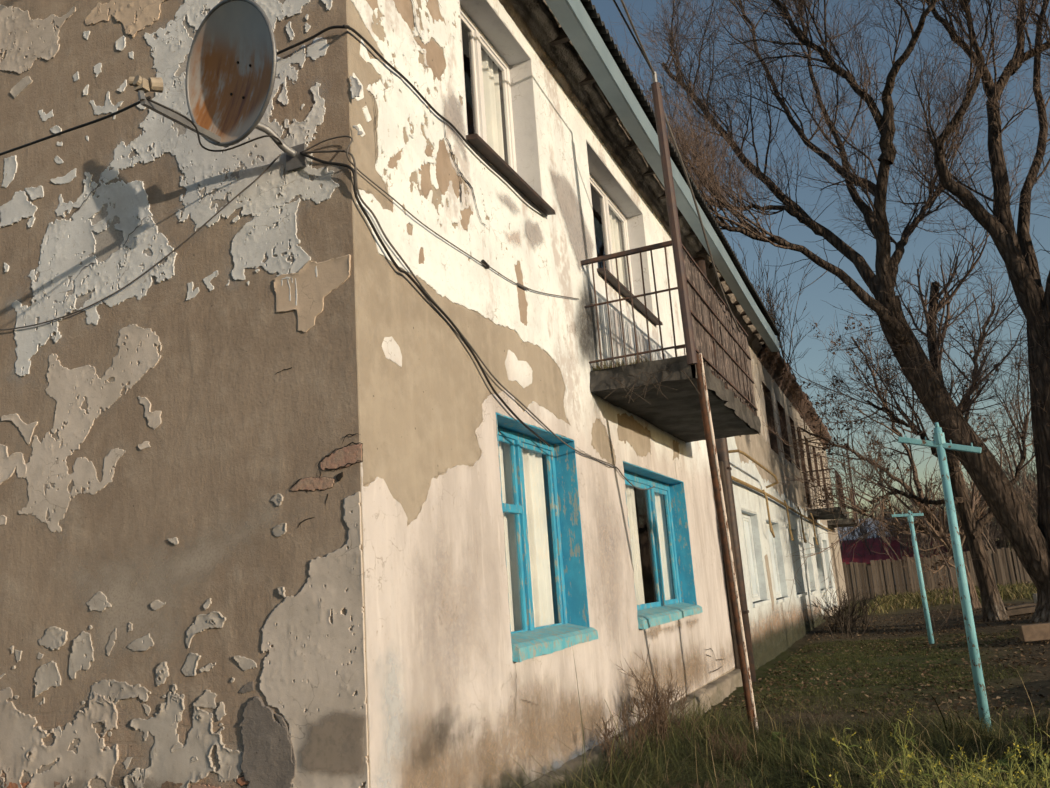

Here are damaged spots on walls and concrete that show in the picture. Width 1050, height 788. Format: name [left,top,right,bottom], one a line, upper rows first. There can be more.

leakage [551,173,593,269]
leakage [577,291,598,359]
peeling [0,0,569,788]
leakage [408,705,603,788]